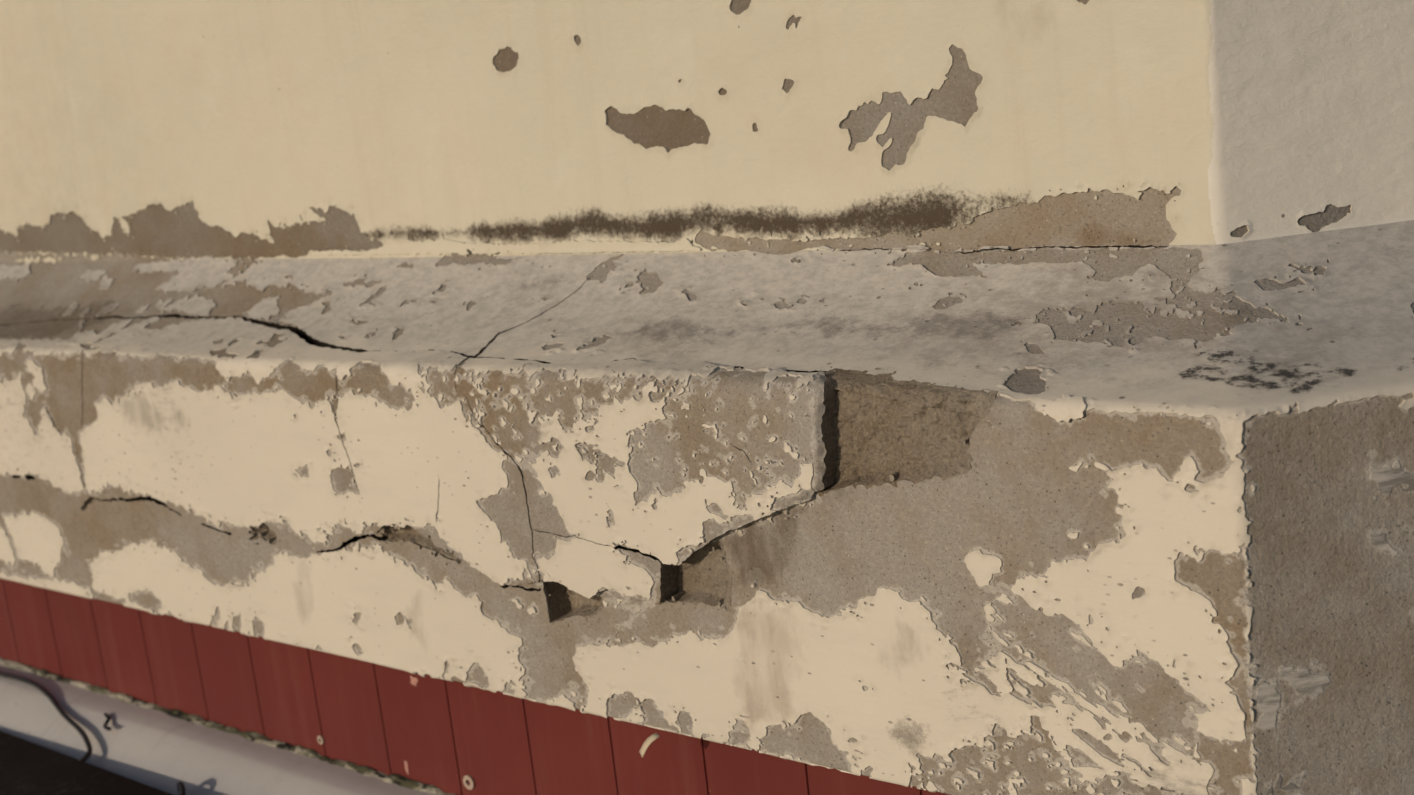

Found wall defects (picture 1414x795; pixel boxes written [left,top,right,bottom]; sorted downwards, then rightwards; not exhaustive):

peeling [494,46,519,72]
peeling [606,105,710,152]
peeling [841,45,983,170]
damp [363,191,1026,243]
crack [46,348,86,488]
crack [334,366,358,489]
crack [340,534,373,548]
crack [455,277,612,582]
peeling [0,186,1414,795]